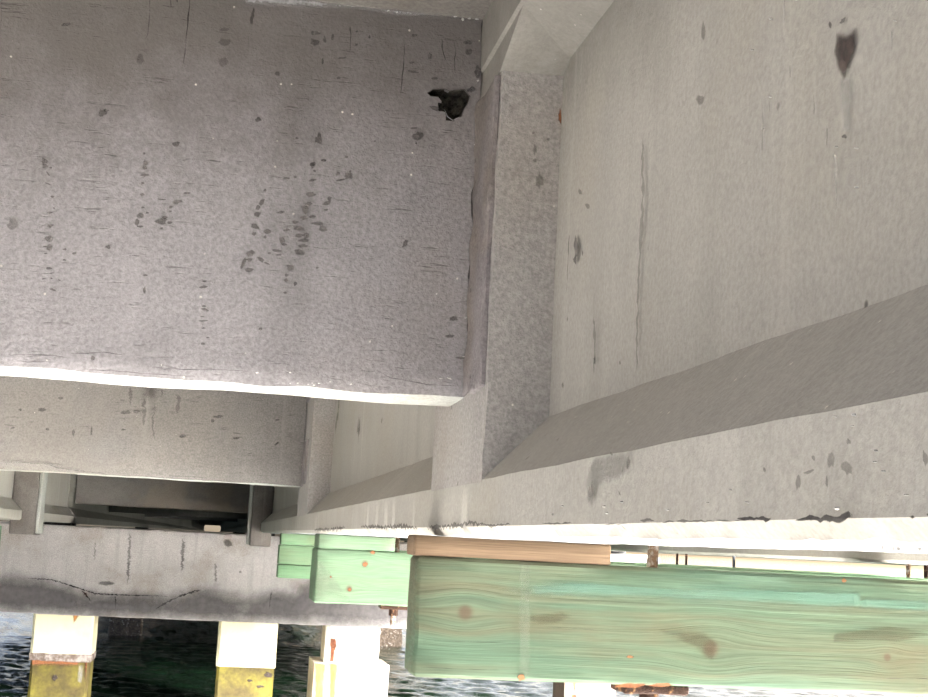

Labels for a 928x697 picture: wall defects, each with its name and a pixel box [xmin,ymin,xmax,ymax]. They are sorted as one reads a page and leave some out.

spalling [427,65,481,121]
crack [315,520,509,532]
crack [594,516,770,544]
crack [796,511,851,523]
water stain [0,579,407,624]
rust [312,638,359,697]